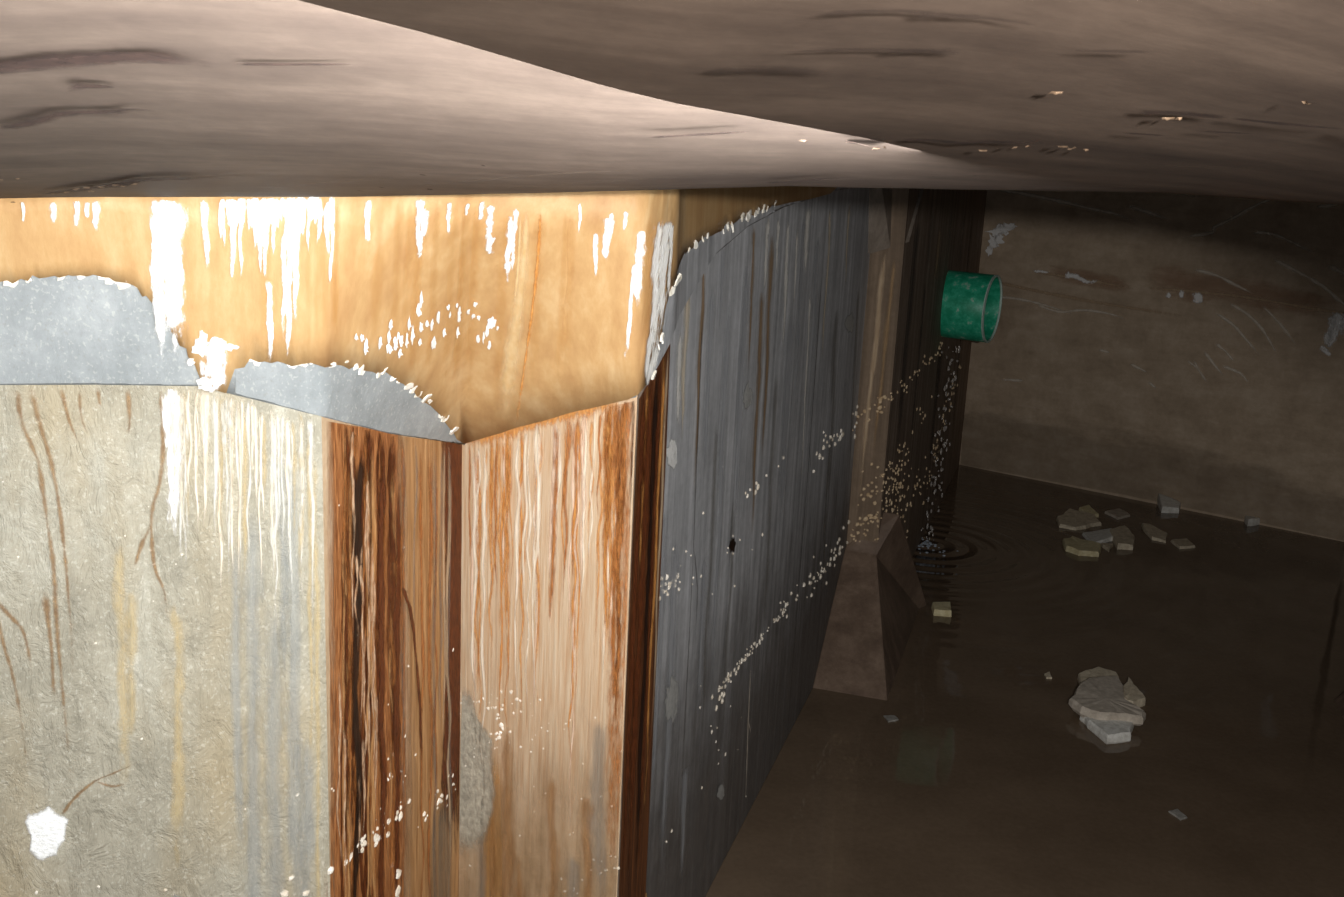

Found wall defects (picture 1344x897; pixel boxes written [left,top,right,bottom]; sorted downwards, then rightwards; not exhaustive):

leakage [74,201,100,228]
peeling [0,275,200,385]
leakage [354,200,541,403]
peeling [235,359,465,445]
leakage [646,209,962,897]
corrosion [330,346,670,897]
spalling [25,807,68,859]
crack [64,770,120,812]
leakage [327,798,411,875]
leakage [418,690,573,828]
leakage [280,876,310,897]